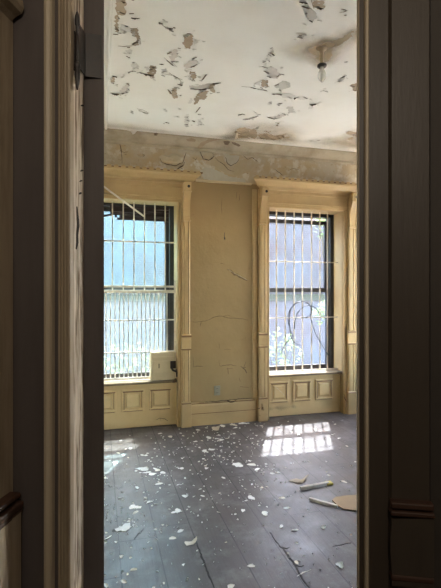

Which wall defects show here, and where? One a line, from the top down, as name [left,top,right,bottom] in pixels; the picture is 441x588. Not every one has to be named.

peeling [299,0,325,25]
damp [308,31,352,62]
peeling [110,0,220,126]
peeling [251,48,319,127]
peeling [224,127,285,147]